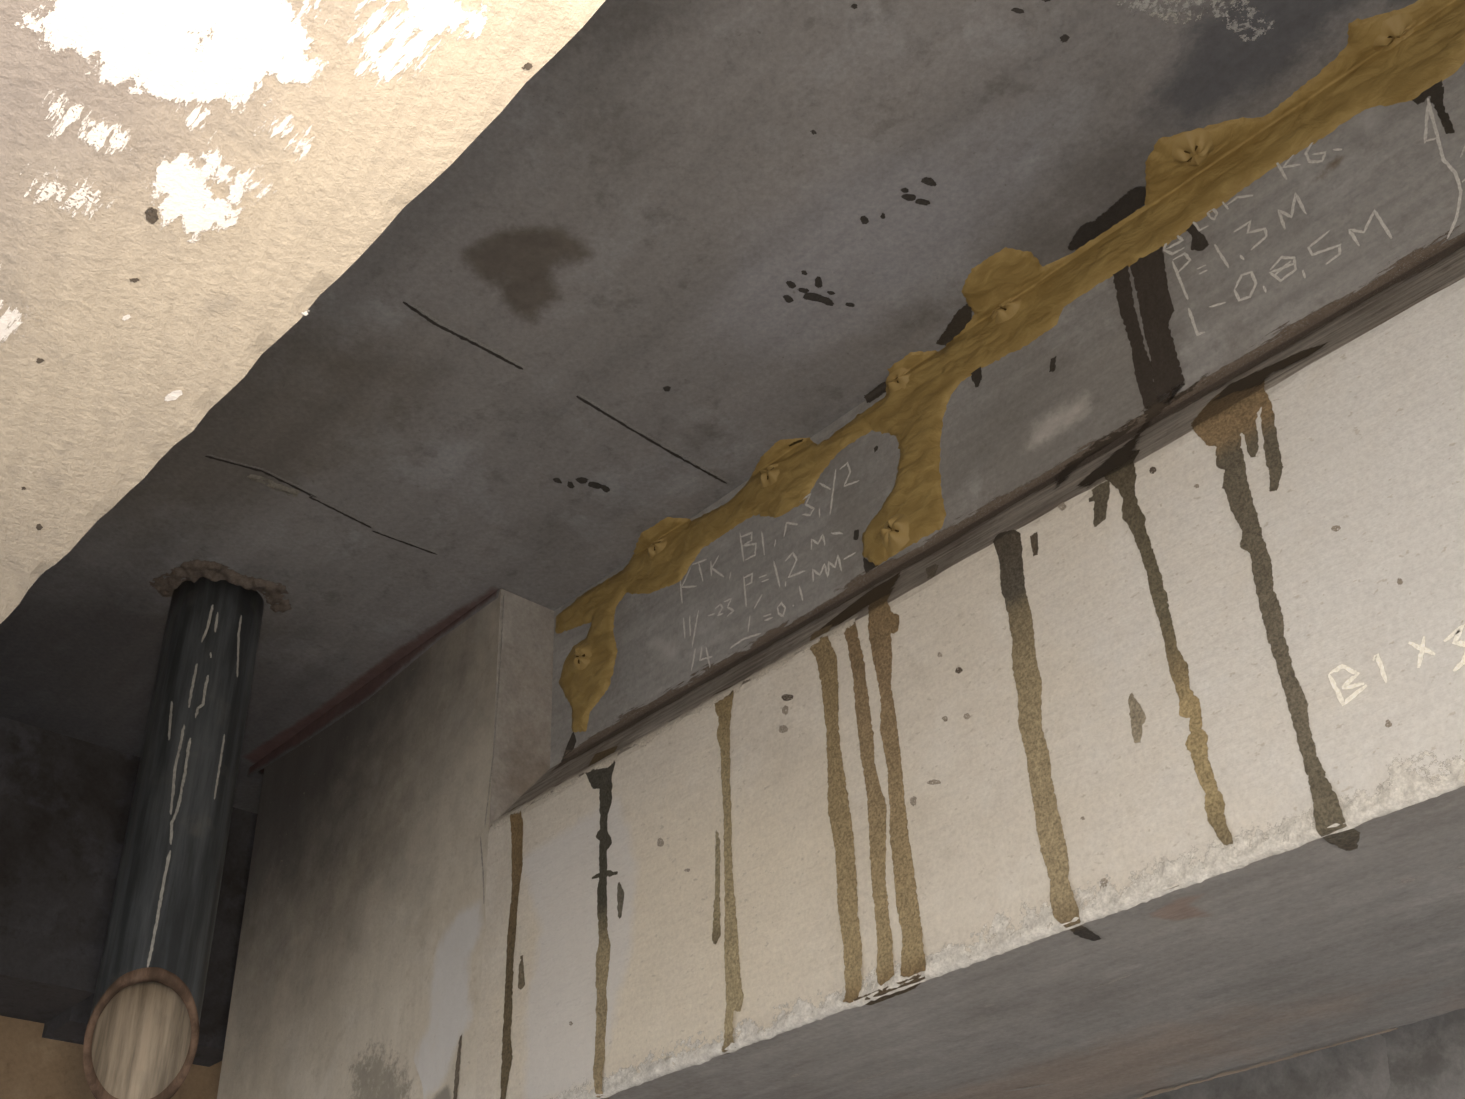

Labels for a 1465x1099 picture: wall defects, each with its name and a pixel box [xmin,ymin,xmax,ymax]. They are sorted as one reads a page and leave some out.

flaking render [346,0,490,87]
water stain [1117,0,1418,138]
flaking render [14,0,329,243]
water stain [1068,186,1146,251]
flaking render [0,300,28,342]
crack [403,300,525,370]
water stain [452,217,602,334]
crack [576,395,727,484]
crack [205,454,437,555]
water stain [1078,246,1233,846]